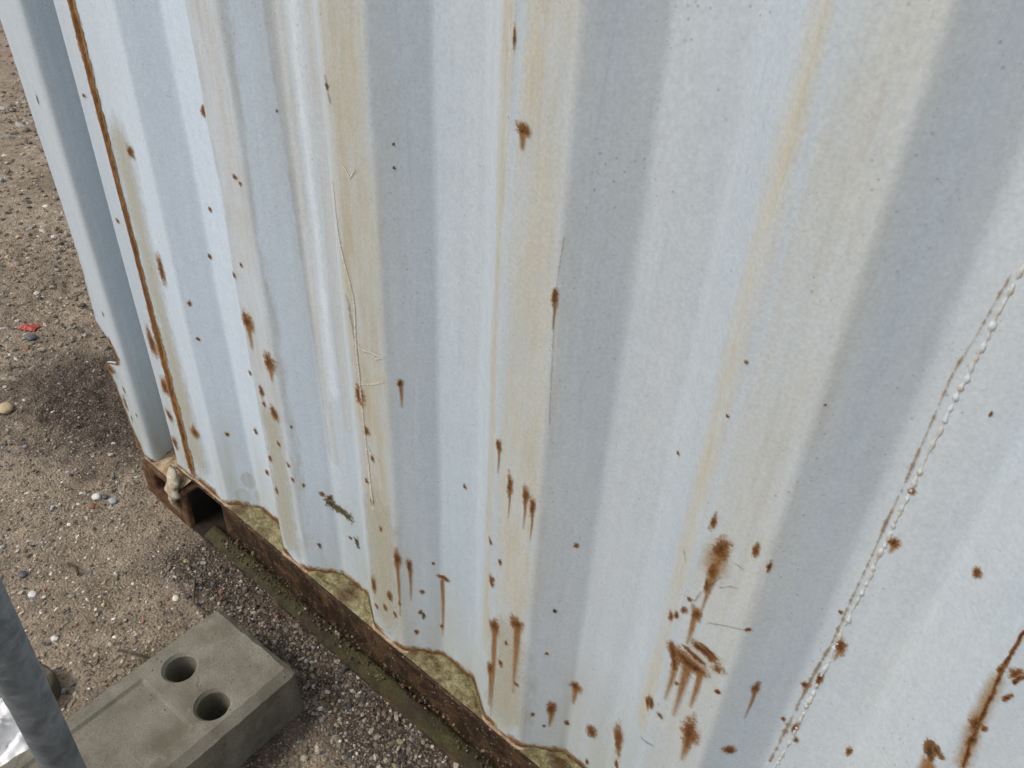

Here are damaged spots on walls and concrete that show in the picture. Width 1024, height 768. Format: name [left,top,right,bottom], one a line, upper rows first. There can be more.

corrosion [515,122,530,149]
corrosion [67,0,279,523]
corrosion [551,288,559,327]
corrosion [258,352,292,429]
corrosion [496,440,536,536]
corrosion [283,546,425,634]
corrosion [432,562,449,628]
corrosion [668,512,733,639]
corrosion [680,717,699,759]
corrosion [960,630,1024,768]